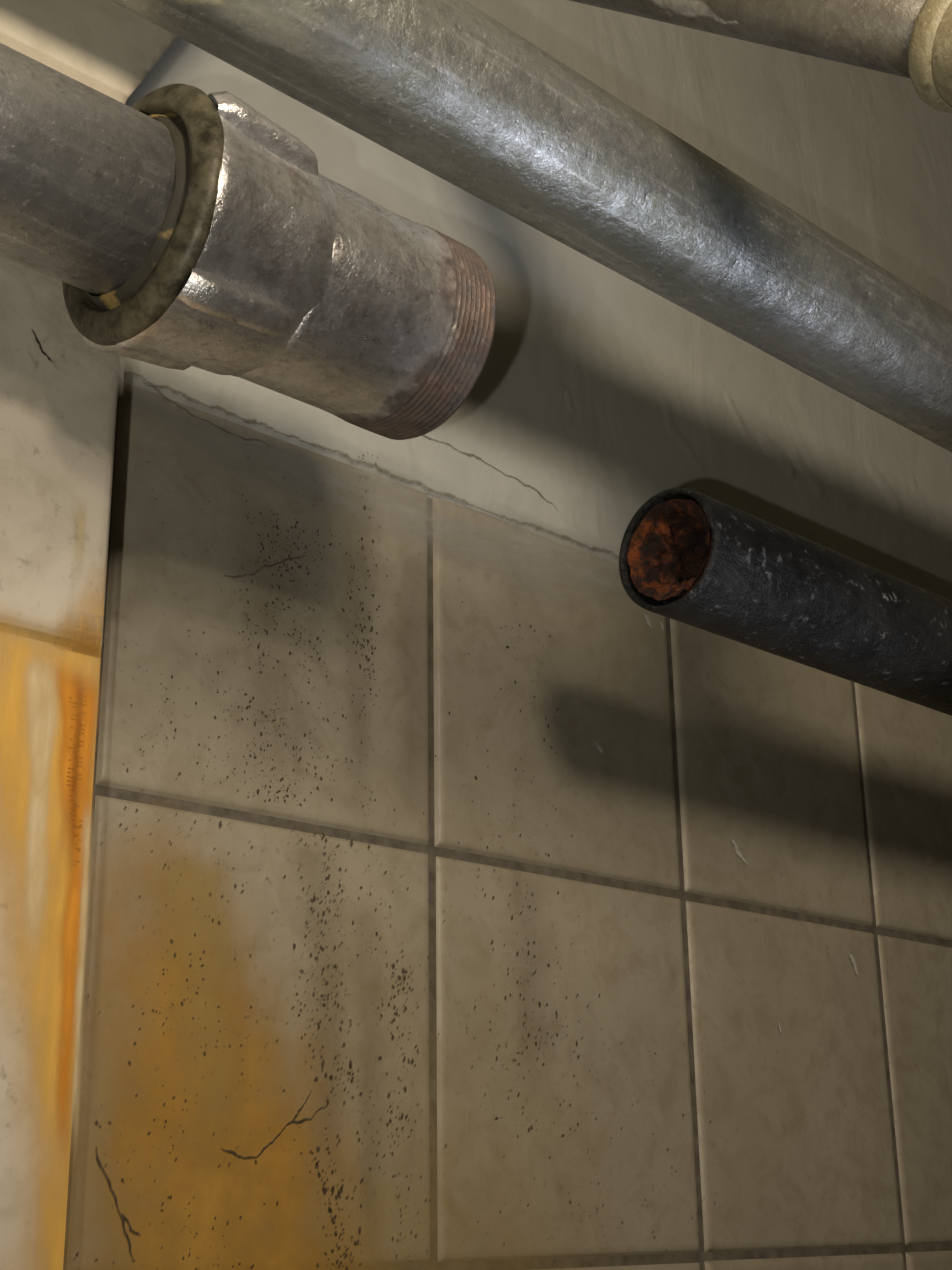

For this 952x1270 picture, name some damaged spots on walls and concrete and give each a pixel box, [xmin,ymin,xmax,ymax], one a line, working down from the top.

water stain [197,452,390,815]
crack [124,371,619,557]
corrosion [0,618,103,1270]
water stain [126,926,259,1100]
crack [221,1089,328,1159]
water stain [259,827,432,1270]